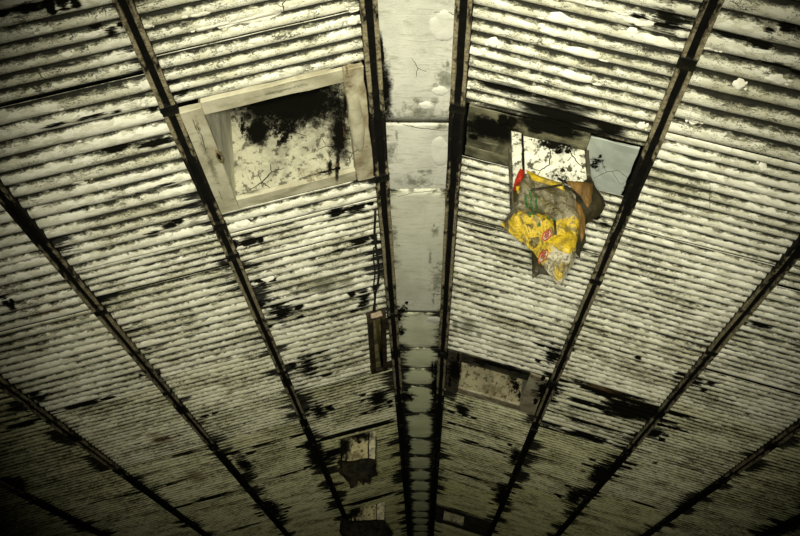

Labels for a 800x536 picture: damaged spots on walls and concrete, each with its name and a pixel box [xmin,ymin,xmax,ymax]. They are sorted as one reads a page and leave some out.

damp [230,85,351,180]
damp [464,80,625,155]
damp [259,297,305,328]
damp [347,284,381,313]
damp [285,349,332,379]
damp [690,368,717,393]
damp [426,341,711,508]